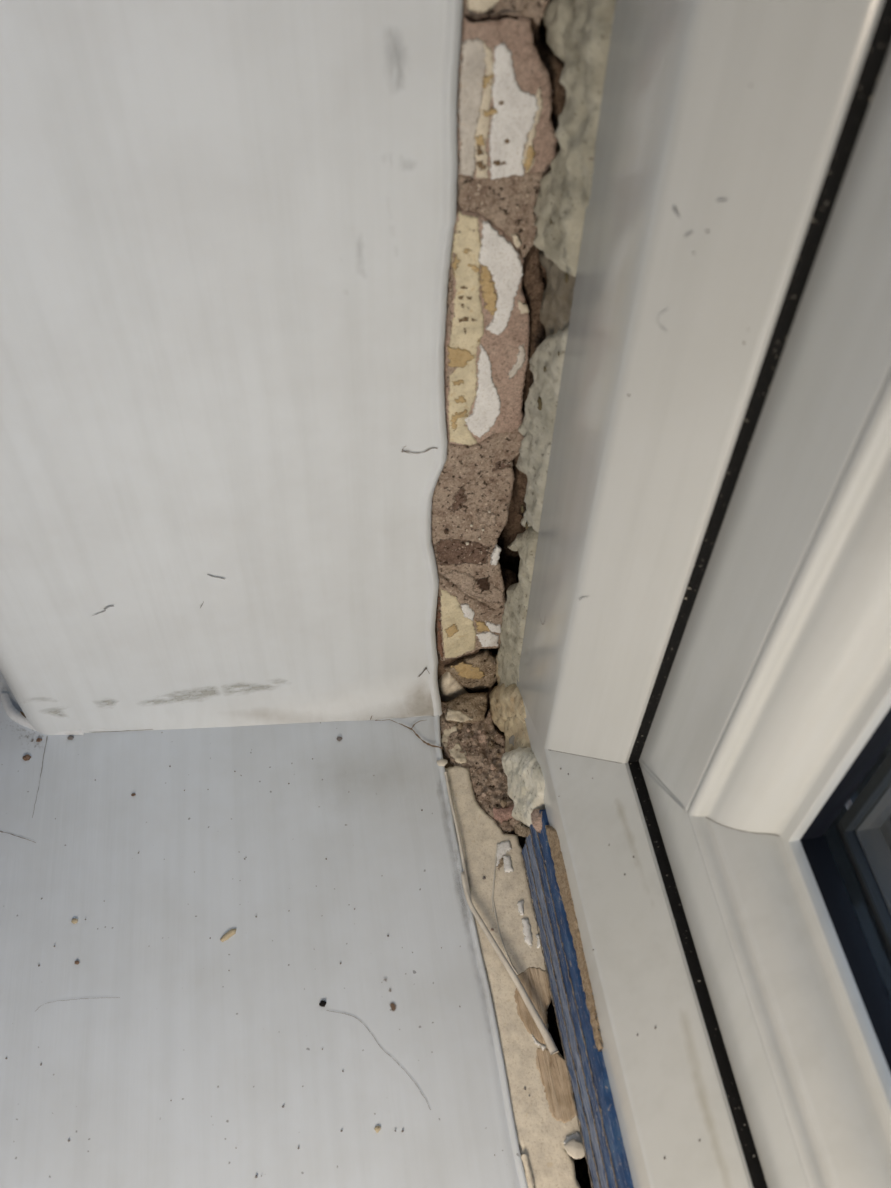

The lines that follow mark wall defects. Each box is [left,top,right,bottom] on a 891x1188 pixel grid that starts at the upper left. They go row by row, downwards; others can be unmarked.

peeling [431,0,558,661]
peeling [440,701,592,1188]